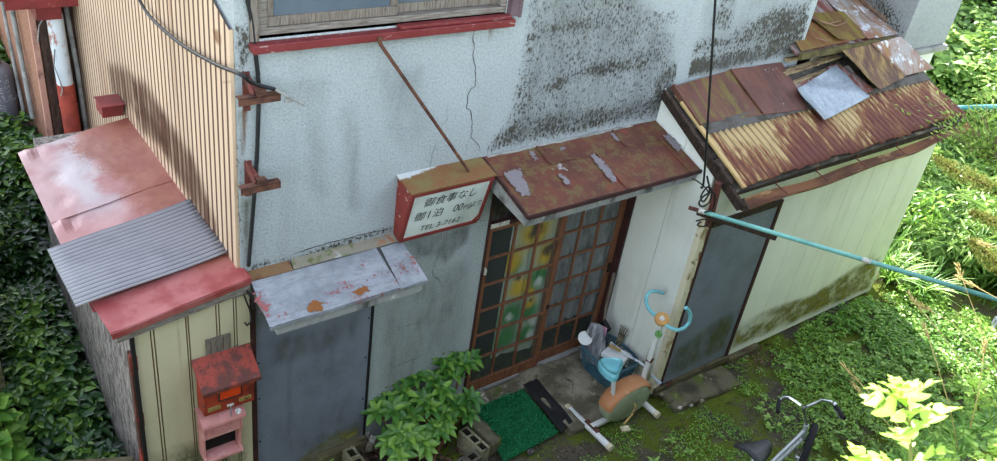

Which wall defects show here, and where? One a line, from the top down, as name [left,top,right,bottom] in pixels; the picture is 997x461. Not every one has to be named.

damp [688,0,809,76]
damp [488,0,677,151]
crack [430,34,480,165]
peeling [663,134,681,153]
peeling [501,168,531,196]
peeling [590,153,617,183]
corrosion [307,300,325,312]